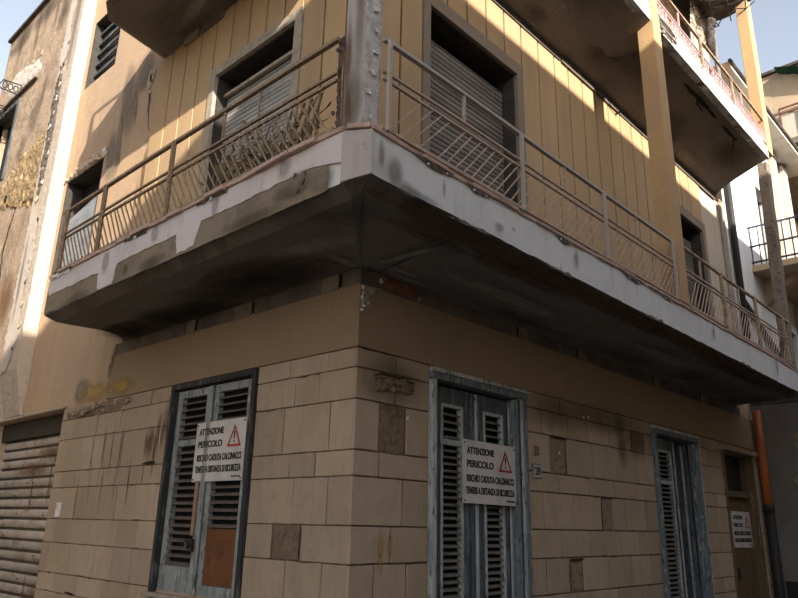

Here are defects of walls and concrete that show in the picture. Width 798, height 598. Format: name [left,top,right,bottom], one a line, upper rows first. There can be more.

water stain [106,59,151,175]
spalling [361,0,383,126]
crack [683,83,737,151]
crack [0,208,16,277]
peeling [0,0,78,420]
spalling [197,188,228,206]